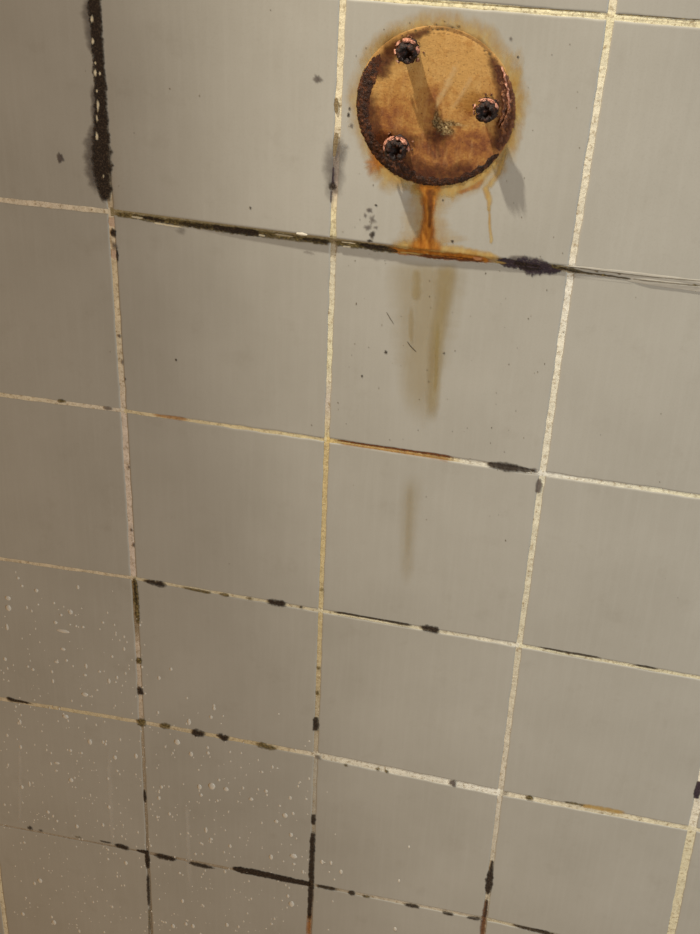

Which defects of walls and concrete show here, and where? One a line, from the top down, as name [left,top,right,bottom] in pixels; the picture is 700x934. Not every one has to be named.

damp [86,0,113,200]
corrosion [354,18,520,264]
damp [117,204,397,253]
damp [498,256,592,276]
corrosion [340,440,450,458]
damp [488,462,542,493]
damp [334,612,409,626]
damp [101,841,175,905]
damp [233,815,335,918]